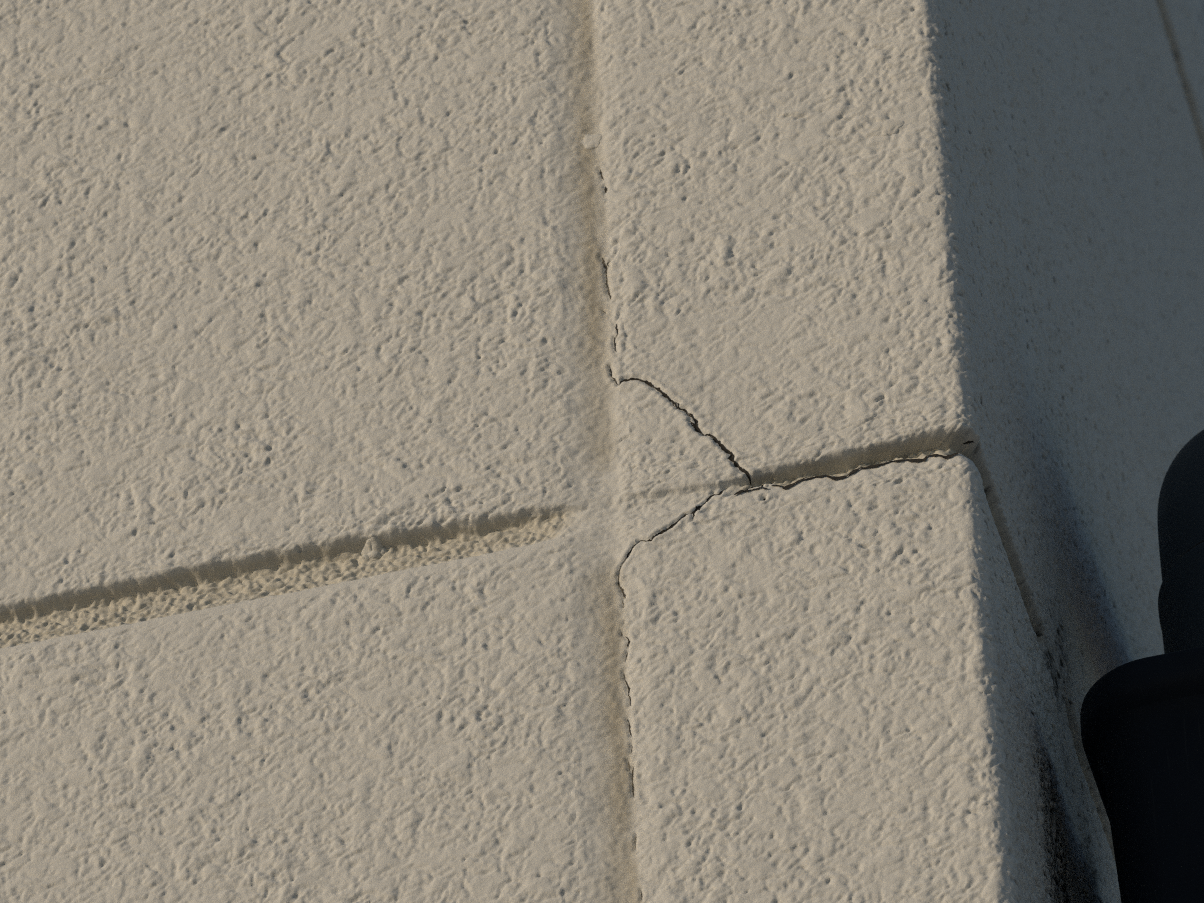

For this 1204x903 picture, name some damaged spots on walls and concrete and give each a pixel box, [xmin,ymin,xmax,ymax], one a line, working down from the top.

crack [601,257,974,797]